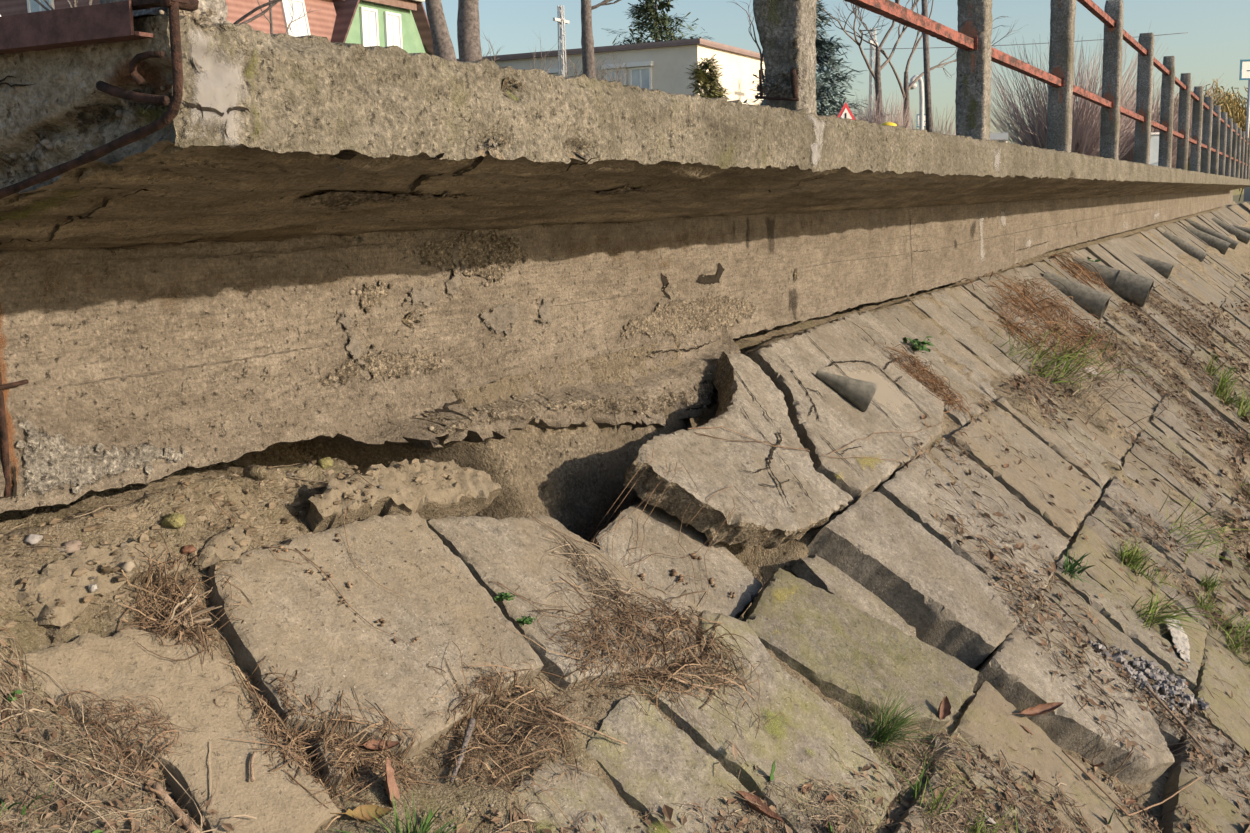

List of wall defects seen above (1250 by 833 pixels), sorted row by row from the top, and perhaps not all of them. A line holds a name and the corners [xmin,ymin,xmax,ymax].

rust [960,5,977,37]
crack [332,153,356,172]
crack [0,187,175,251]
crack [634,338,719,359]
rust [0,308,18,488]
spalling [0,371,187,497]
crack [415,399,473,424]
crack [686,371,813,508]
crack [776,335,930,480]
crack [0,466,18,499]